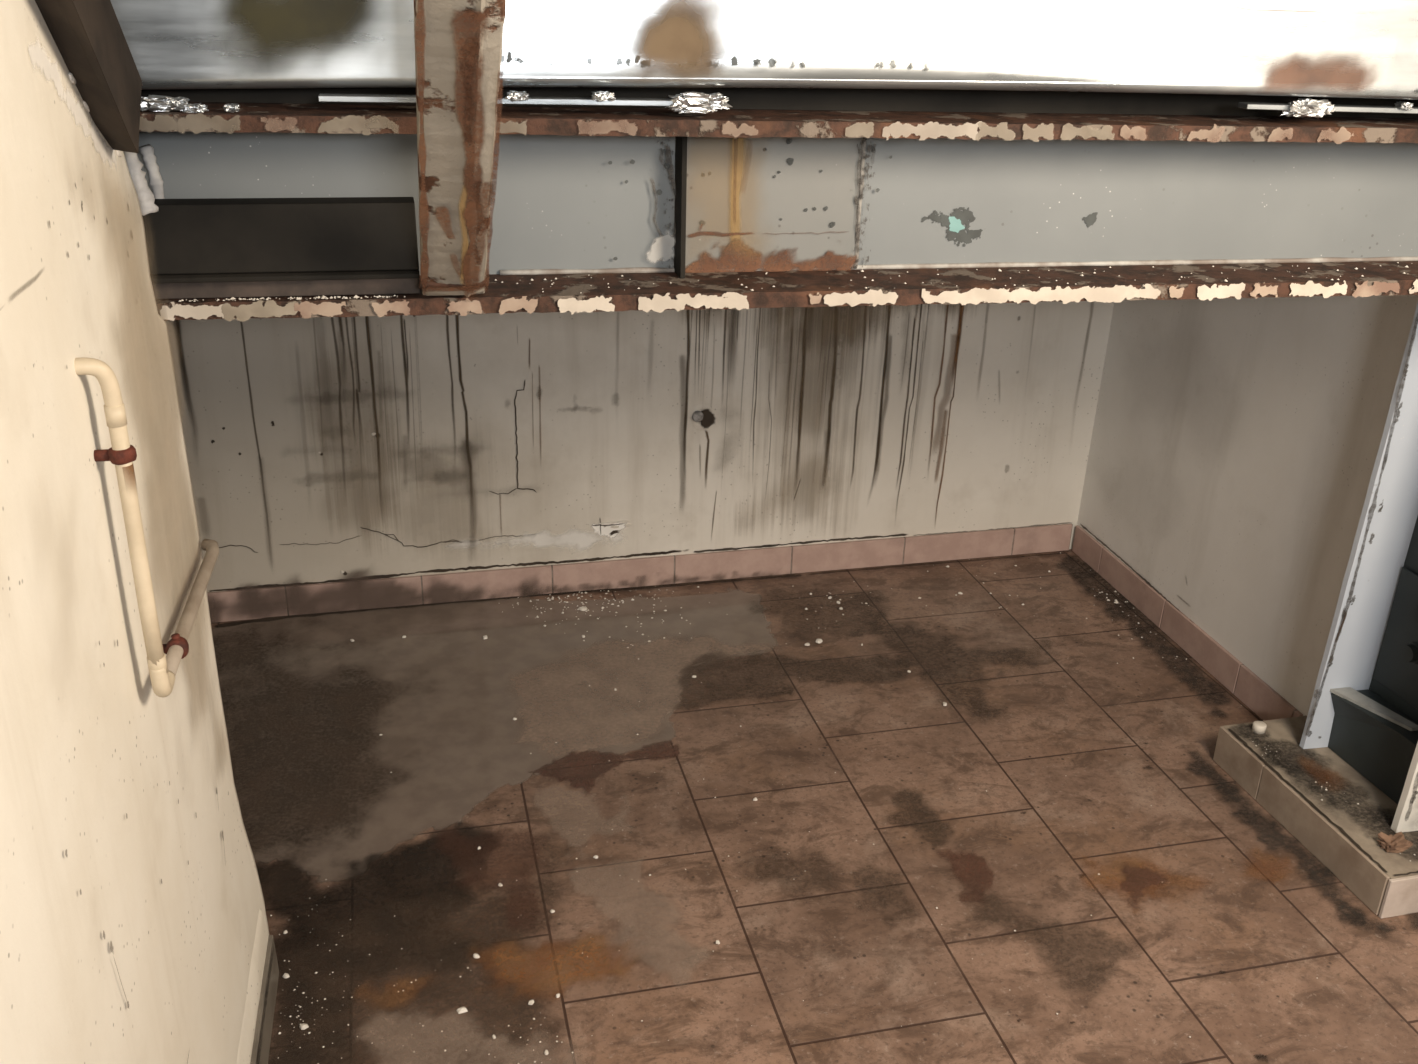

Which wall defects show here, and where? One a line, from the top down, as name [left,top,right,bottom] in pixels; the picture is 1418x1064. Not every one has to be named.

damp [227,0,373,68]
rust [415,0,503,295]
rust [685,138,857,273]
peeling [845,121,1147,270]
peeling [638,292,749,313]
peeling [809,289,898,307]
peeling [921,279,1418,305]
damp [446,315,472,482]
crack [490,380,536,494]
damp [792,305,891,498]
crack [219,527,537,553]
damp [208,572,1025,1064]